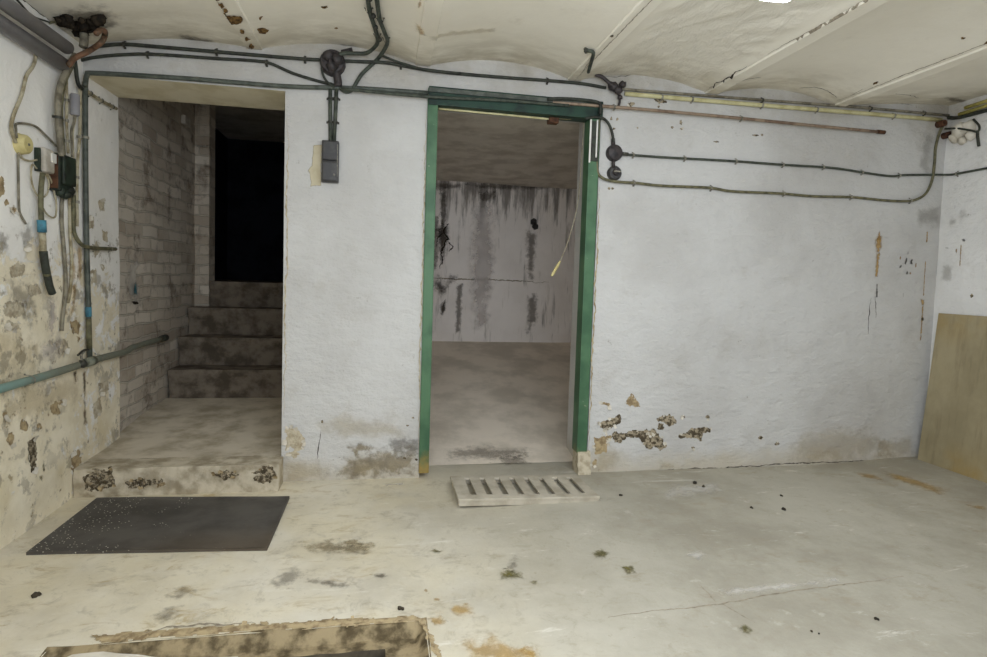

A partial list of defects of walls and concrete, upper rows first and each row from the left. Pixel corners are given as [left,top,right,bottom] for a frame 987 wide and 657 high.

spalling [216,0,269,49]
peeling [89,198,108,284]
peeling [3,243,42,333]
flaking render [48,320,83,358]
flaking render [588,187,712,468]
peeling [92,380,109,419]
peeling [2,412,42,474]
spalling [71,450,165,492]
spalling [211,470,239,481]
spalling [251,465,277,484]
damp [346,445,412,476]